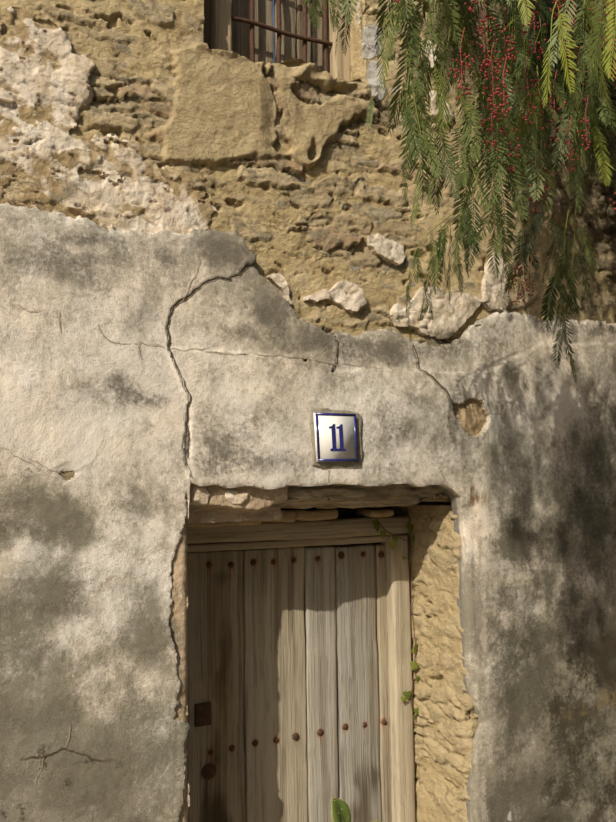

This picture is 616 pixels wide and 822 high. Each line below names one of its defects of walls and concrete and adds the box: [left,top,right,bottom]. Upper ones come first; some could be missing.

flaking render [0,0,616,346]
leakage [108,374,161,404]
crack [97,248,385,477]
crack [413,345,459,447]
leakage [427,329,460,352]
spalling [453,397,488,437]
crack [0,432,105,479]
leakage [5,487,88,536]
leakage [123,484,157,517]
leakage [473,490,616,822]
crack [19,727,114,784]
leakage [43,738,142,816]